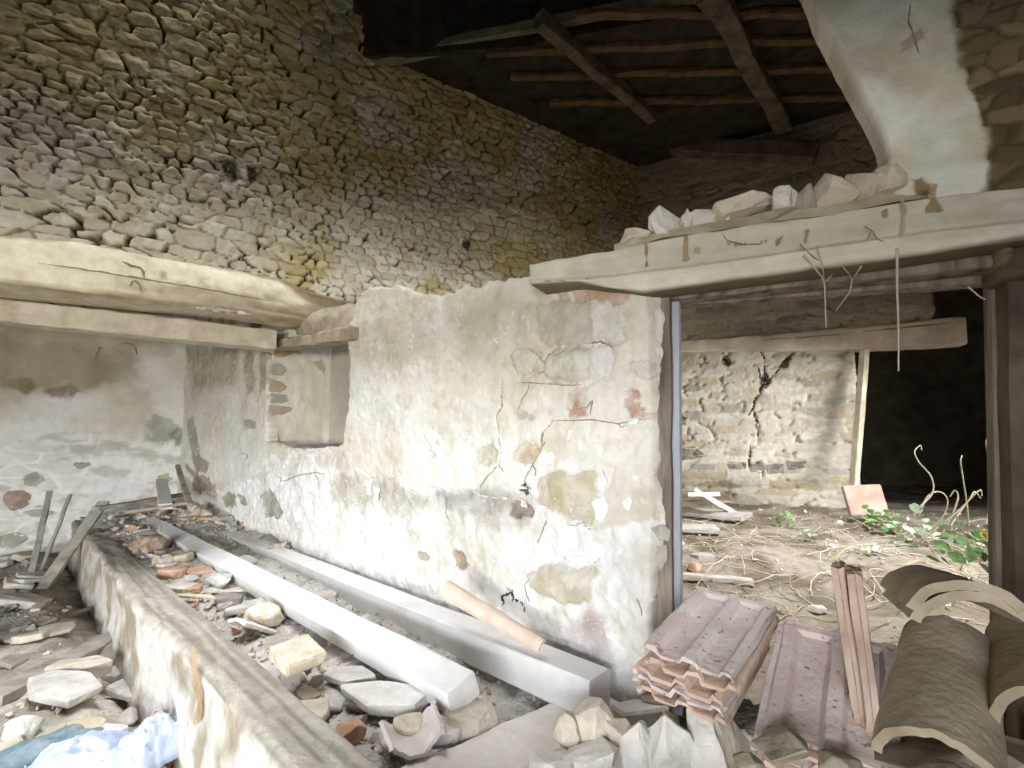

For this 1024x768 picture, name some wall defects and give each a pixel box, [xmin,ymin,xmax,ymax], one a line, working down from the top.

crack [480,347,653,487]
flaking render [513,290,630,470]
flaking render [625,390,646,425]
flaking render [631,361,660,379]
crack [748,352,790,468]
flaking render [3,472,53,516]
peeling [591,442,608,523]